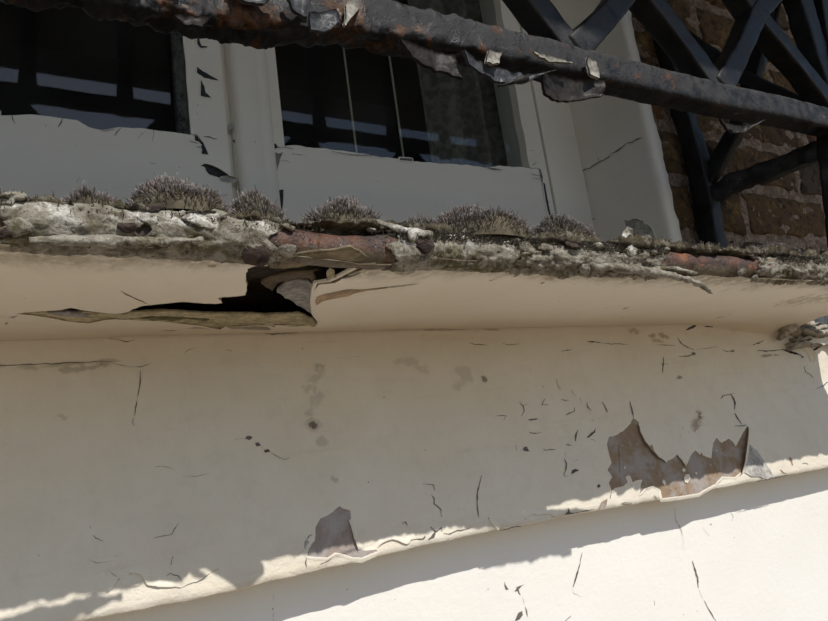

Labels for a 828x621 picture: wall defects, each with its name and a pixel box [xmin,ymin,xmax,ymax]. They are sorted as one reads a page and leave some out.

peeling [195,66,221,99]
peeling [189,134,240,195]
crack [583,138,640,192]
spalling [20,244,376,332]
crack [662,338,734,373]
crack [753,340,828,389]
crack [720,393,746,427]
peeling [565,402,788,515]
peeling [296,502,381,567]
crack [675,514,716,621]